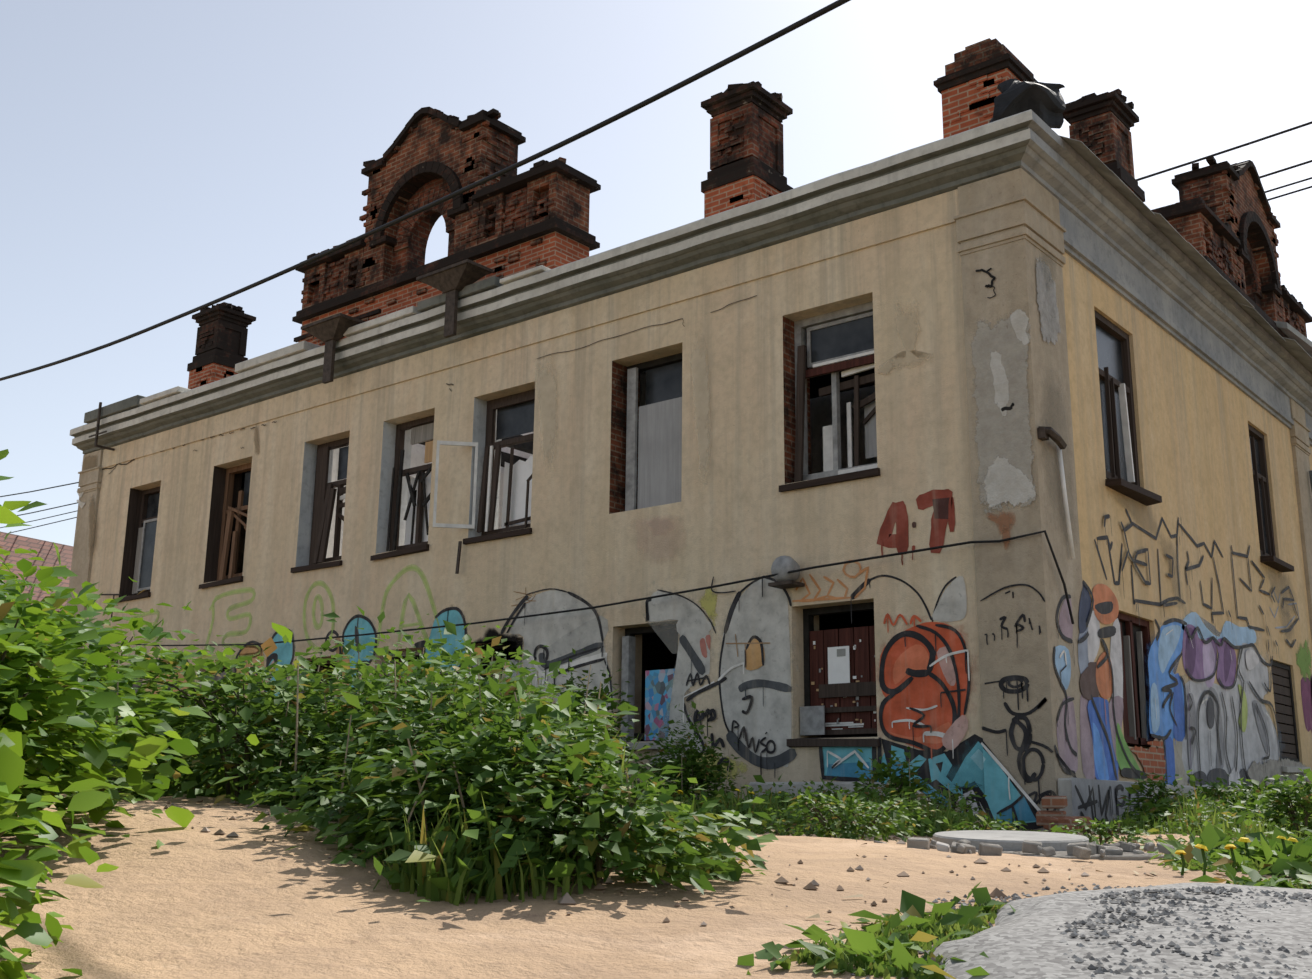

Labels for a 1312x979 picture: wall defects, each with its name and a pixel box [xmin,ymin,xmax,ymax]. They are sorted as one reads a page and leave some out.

peeling [971,309,1036,514]